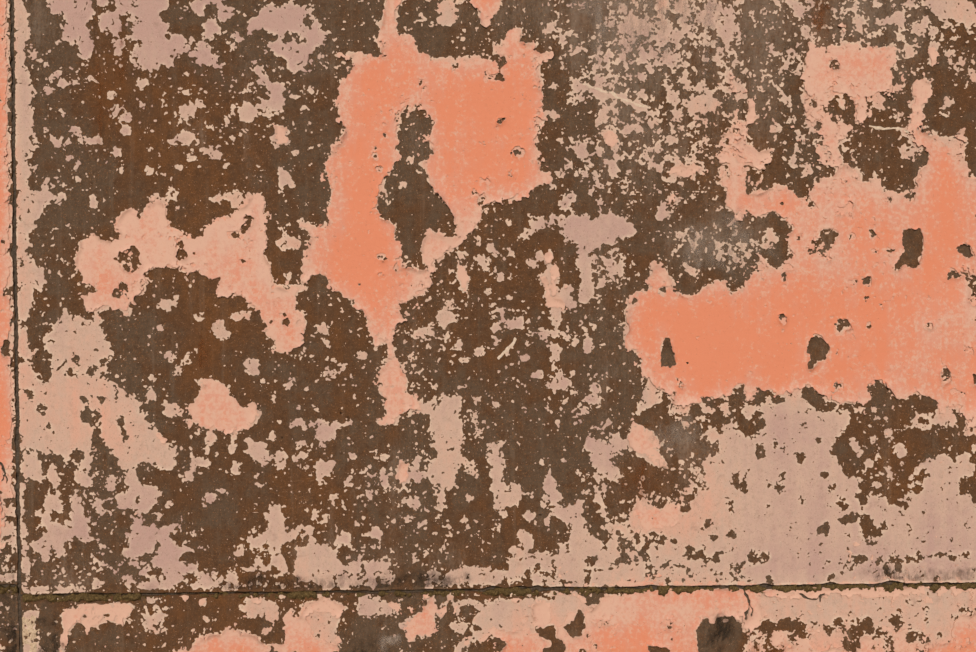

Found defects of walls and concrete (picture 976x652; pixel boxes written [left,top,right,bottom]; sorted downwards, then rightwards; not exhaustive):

spalling [510,135,525,159]
peeling [227,210,258,252]
peeling [803,217,839,262]
peeling [834,195,883,241]
peeling [114,245,142,277]
spalling [841,228,924,295]
peeling [829,316,856,339]
spalling [660,338,676,368]
spalling [806,333,838,373]
spalling [938,358,965,396]
spalling [645,642,670,652]